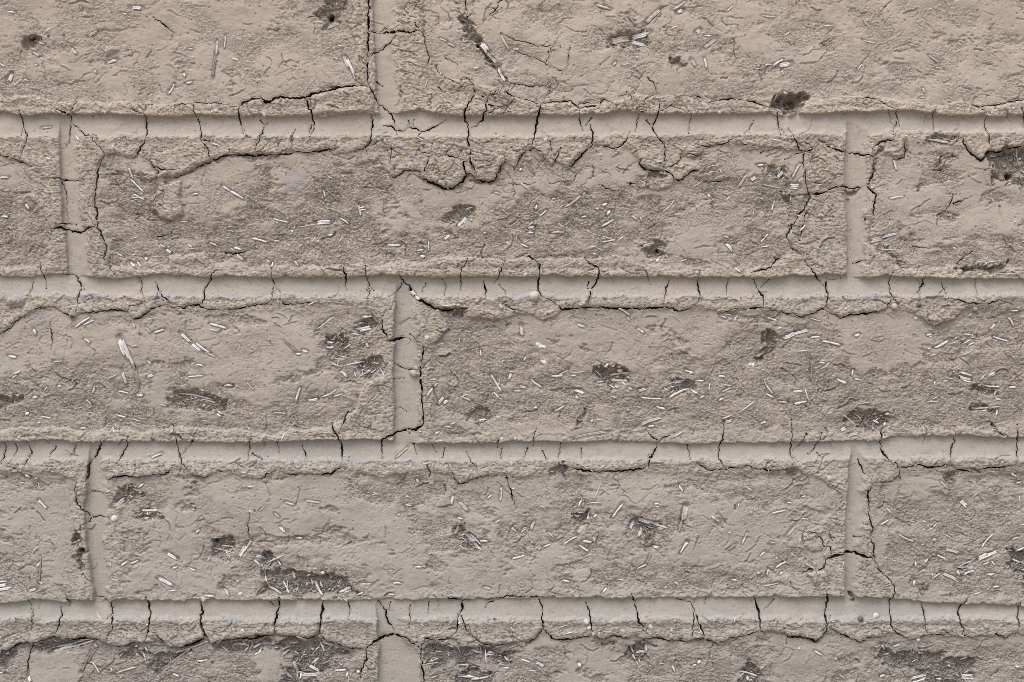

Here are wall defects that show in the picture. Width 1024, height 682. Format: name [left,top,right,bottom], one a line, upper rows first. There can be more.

crack [0,0,1005,507]
crack [931,98,1024,163]
crack [0,411,1022,682]